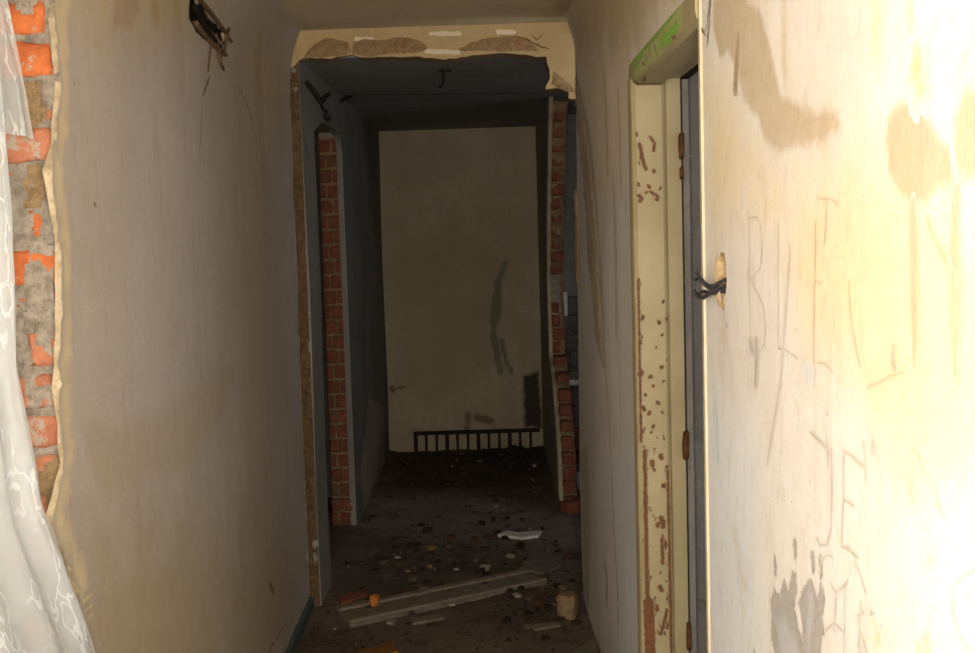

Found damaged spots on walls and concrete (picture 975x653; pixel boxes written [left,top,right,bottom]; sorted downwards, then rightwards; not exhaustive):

flaking render [0,0,94,647]
spalling [290,29,539,606]
corrosion [636,277,674,653]
water stain [711,0,842,157]
spalling [770,537,826,653]
water stain [882,75,975,385]